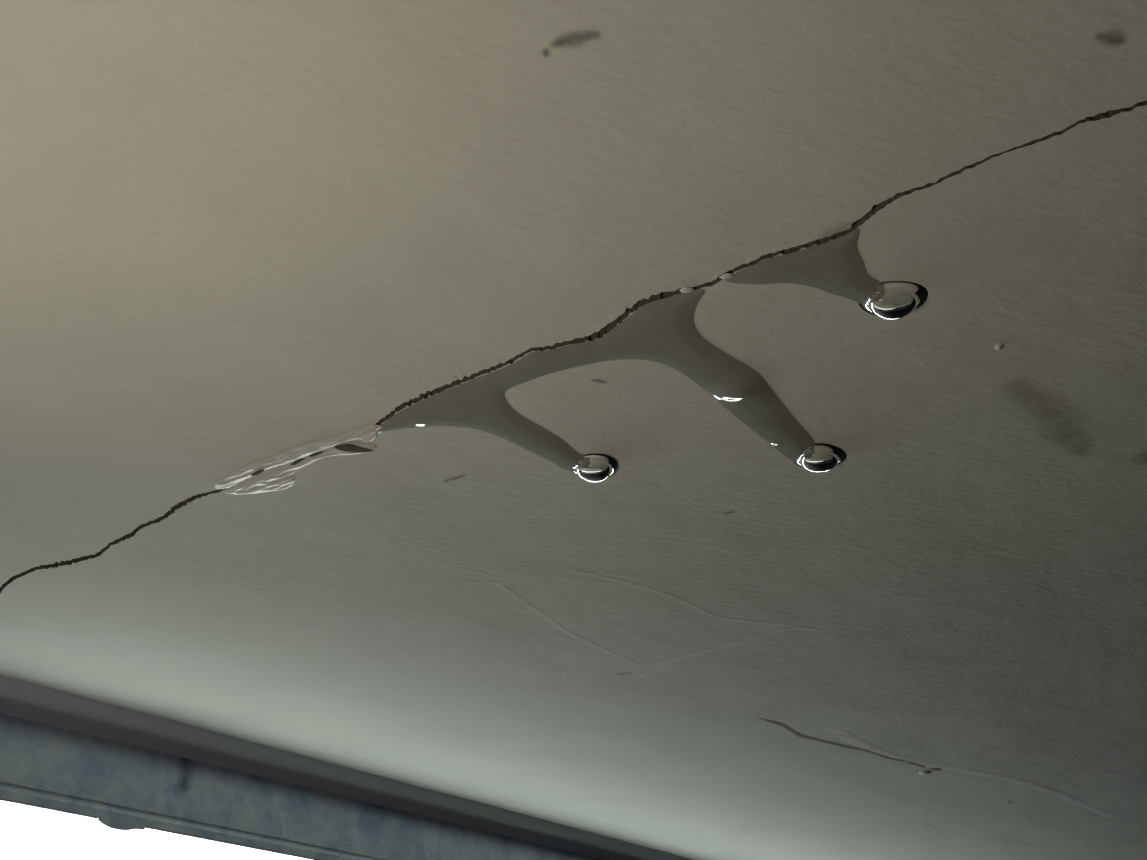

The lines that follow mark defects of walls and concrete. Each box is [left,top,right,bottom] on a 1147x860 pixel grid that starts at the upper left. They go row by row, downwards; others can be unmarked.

crack [371,100,1147,425]
leakage [725,229,928,320]
leakage [379,290,847,483]
crack [0,488,226,598]